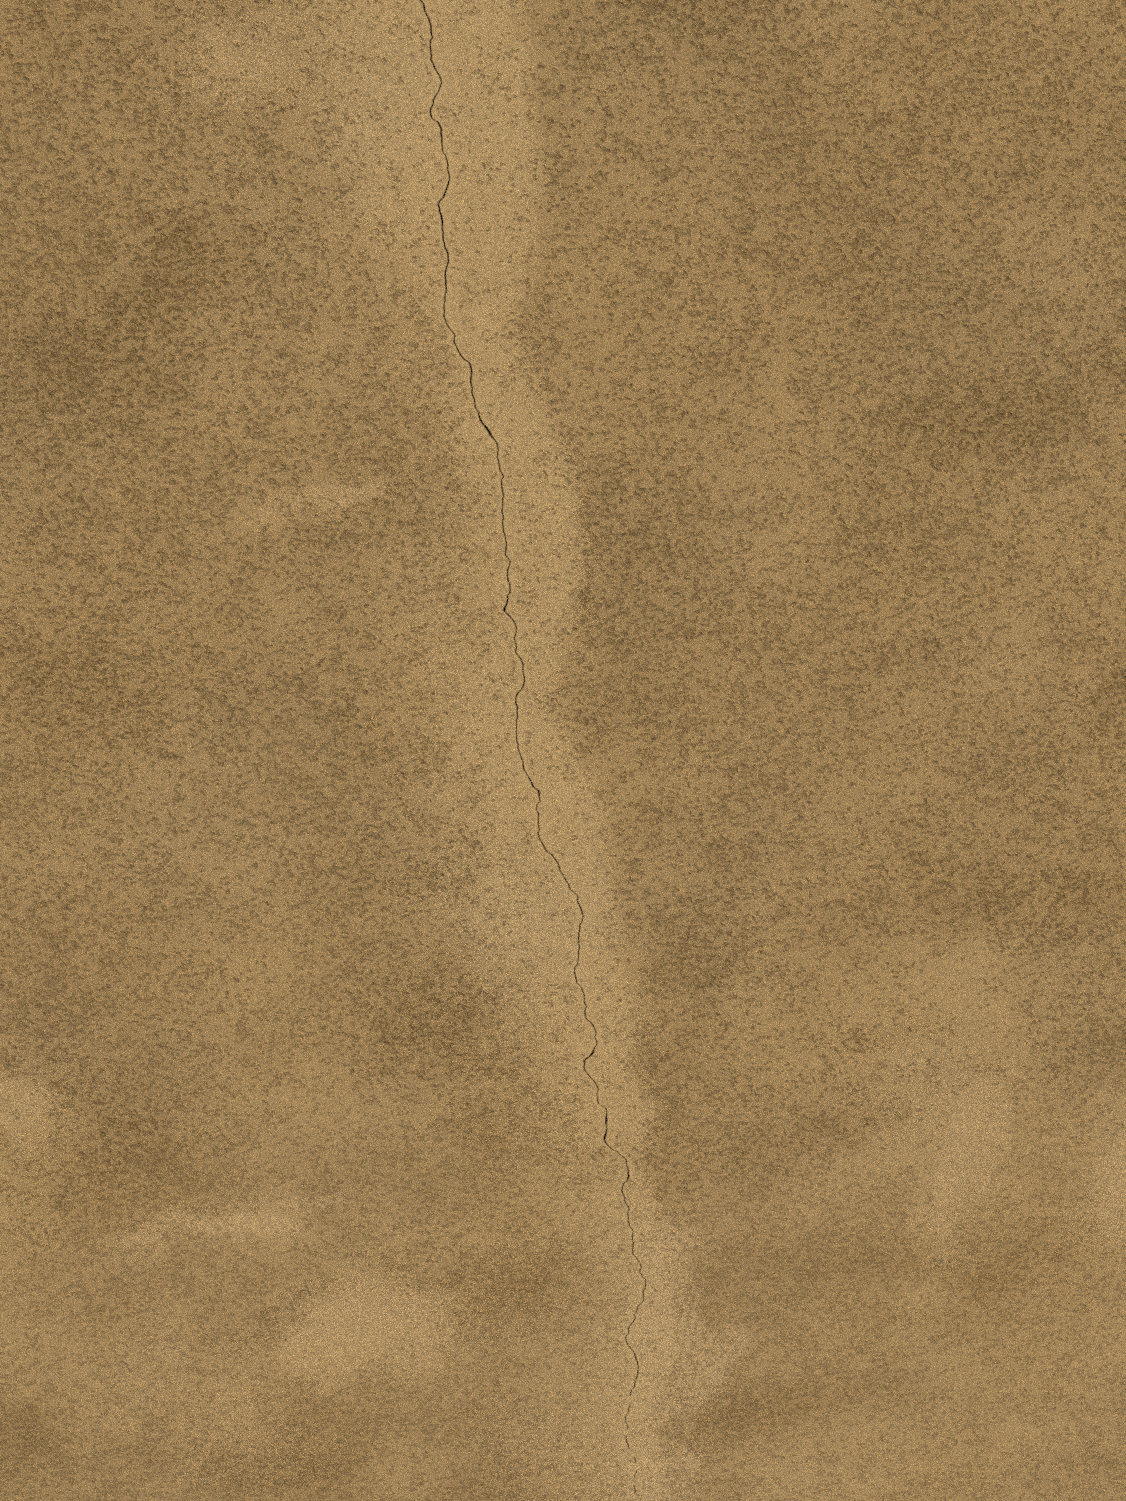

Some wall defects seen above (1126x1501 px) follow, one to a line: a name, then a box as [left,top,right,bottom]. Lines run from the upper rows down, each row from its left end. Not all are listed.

crack [420,0,646,1493]